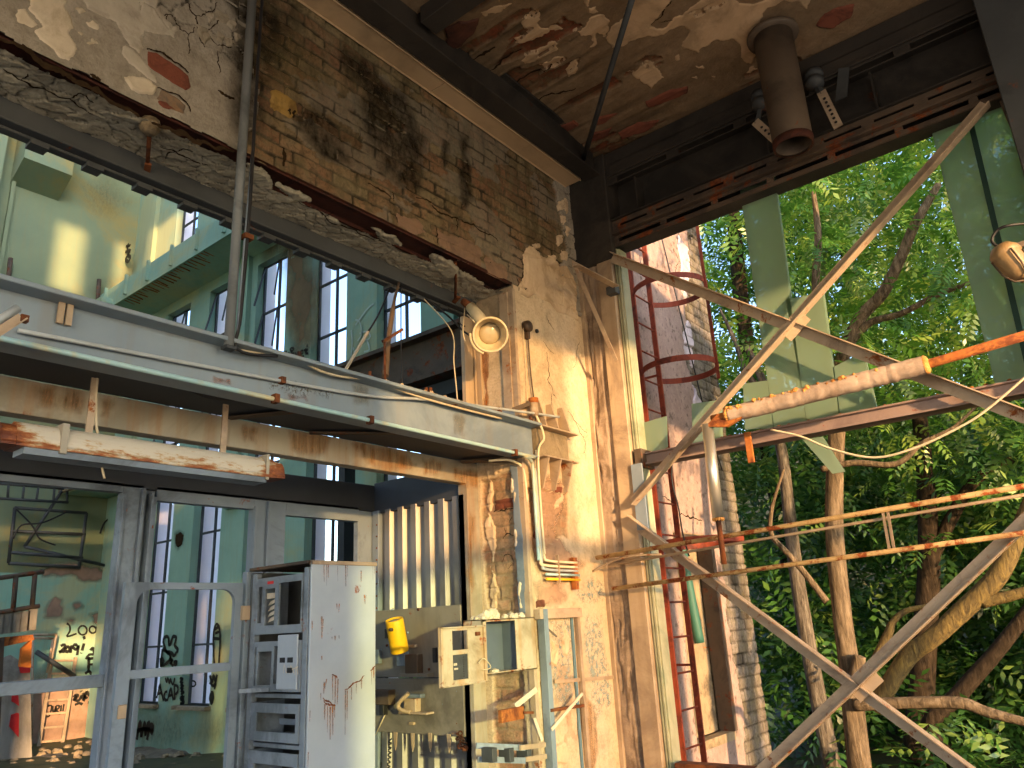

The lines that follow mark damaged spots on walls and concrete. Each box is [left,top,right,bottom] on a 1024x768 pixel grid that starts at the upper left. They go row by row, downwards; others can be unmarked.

peeling [16,0,191,114]
crack [1,38,234,165]
crack [164,0,235,100]
mould [297,111,346,160]
mould [343,56,423,188]
water stain [460,140,472,207]
peeling [481,3,512,16]
peeling [628,60,664,88]
peeling [515,0,810,77]
spalling [371,198,579,321]
peeling [485,464,545,614]
spalling [545,480,566,509]